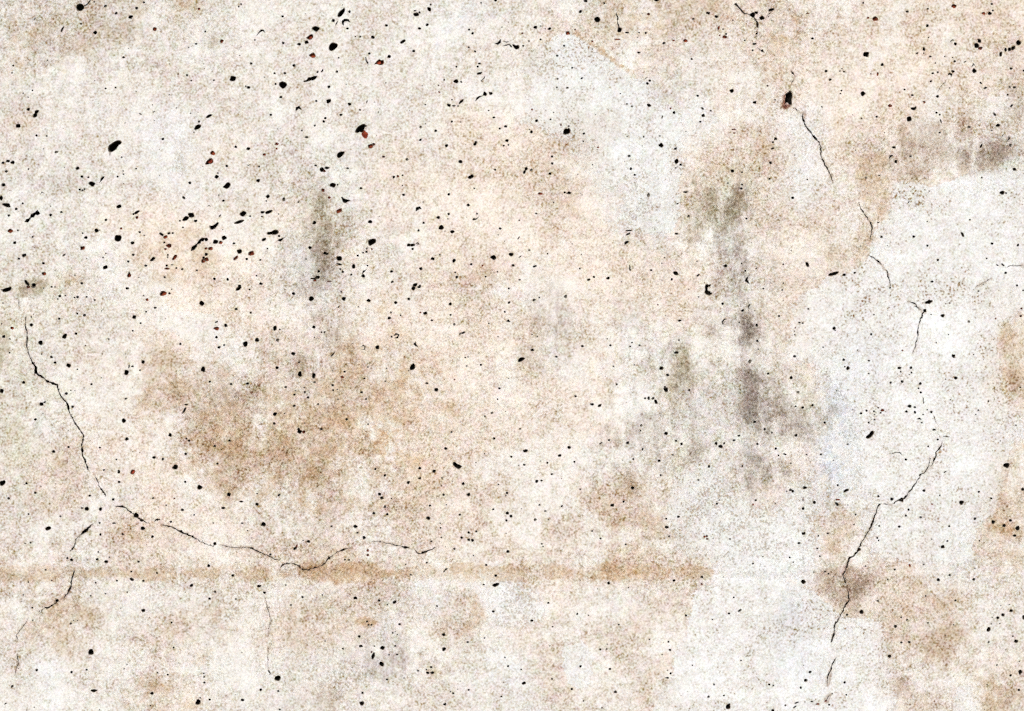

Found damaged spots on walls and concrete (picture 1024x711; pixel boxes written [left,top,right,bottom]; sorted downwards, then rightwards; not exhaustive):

crack [796,109,833,181]
crack [858,202,891,288]
crack [911,302,925,352]
crack [18,300,435,572]
crack [15,523,94,673]
crack [826,398,949,701]